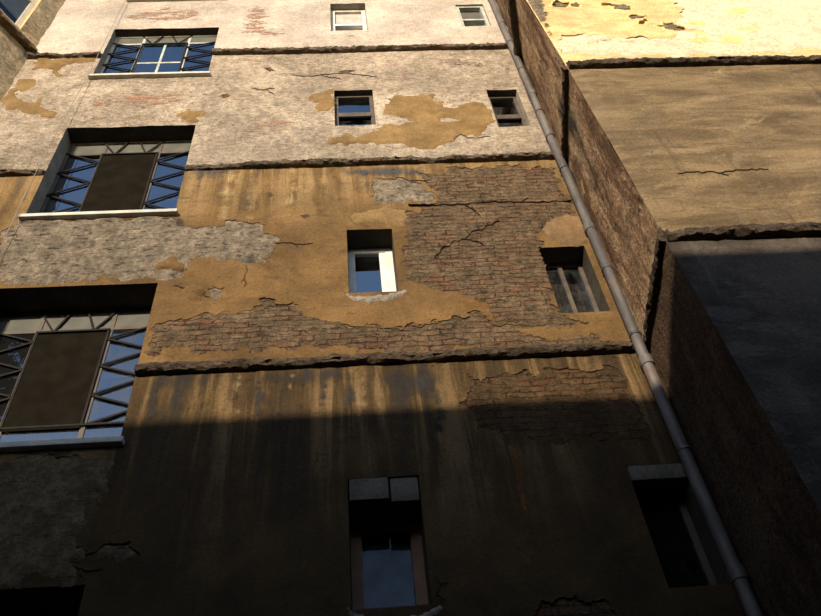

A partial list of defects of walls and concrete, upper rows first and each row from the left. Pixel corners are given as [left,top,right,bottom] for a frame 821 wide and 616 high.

flaking render [528,0,821,58]
crack [683,167,763,175]
flaking render [0,216,284,287]
flaking render [142,164,612,358]
flaking render [0,451,120,589]